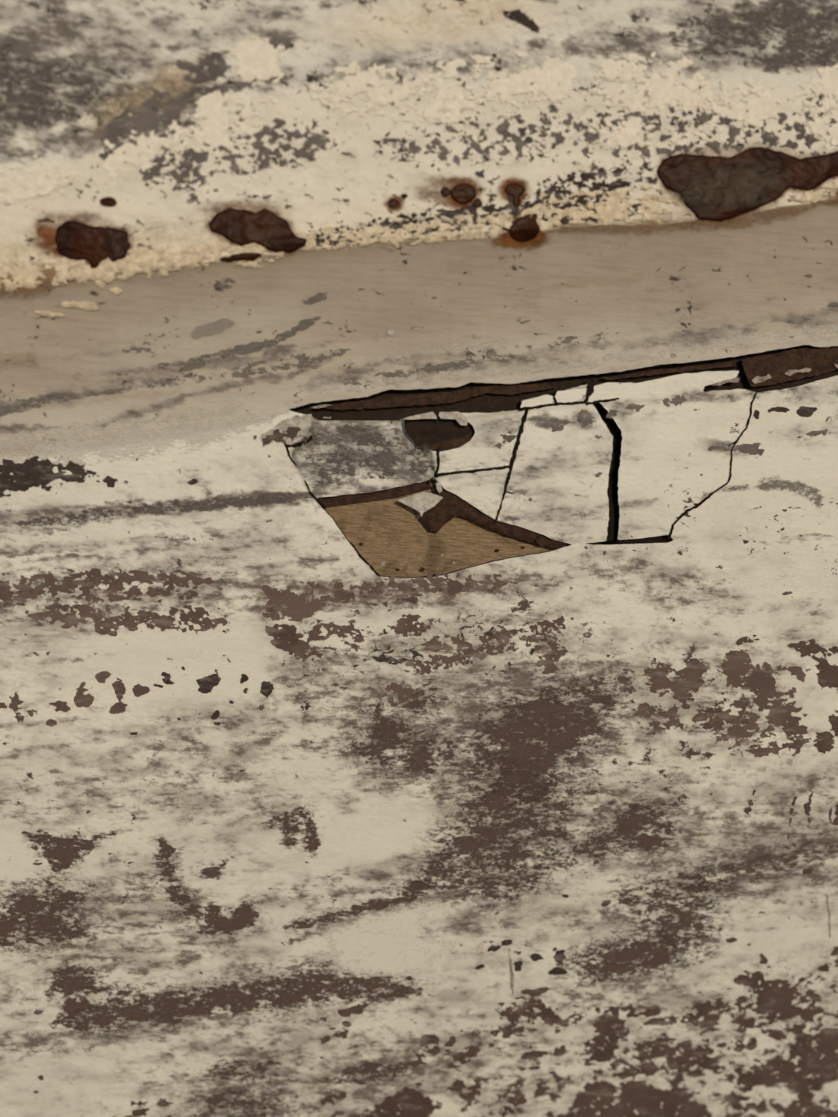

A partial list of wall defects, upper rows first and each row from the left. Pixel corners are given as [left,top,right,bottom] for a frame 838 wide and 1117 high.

corrosion [36,214,132,268]
corrosion [208,203,307,262]
corrosion [385,177,482,211]
corrosion [494,178,547,249]
damp [552,200,838,233]
corrosion [657,147,838,222]
damp [0,264,70,297]
crack [428,377,758,545]
spalling [0,345,838,665]
peeling [0,666,185,727]
peeling [116,613,838,1117]
peeling [0,830,423,1044]